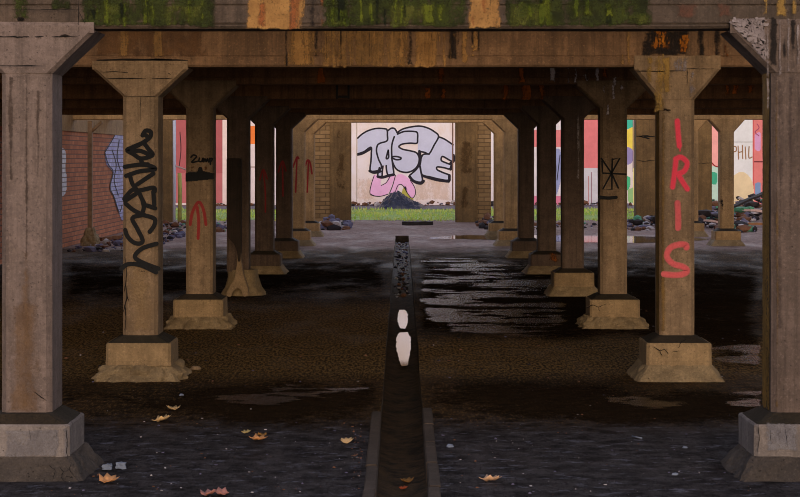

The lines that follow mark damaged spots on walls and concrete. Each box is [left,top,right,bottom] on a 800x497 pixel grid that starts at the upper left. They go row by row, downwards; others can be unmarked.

corrosion [246,0,305,30]
corrosion [468,0,501,29]
leakage [284,7,480,68]
peeling [730,17,769,60]
leakage [421,0,800,427]